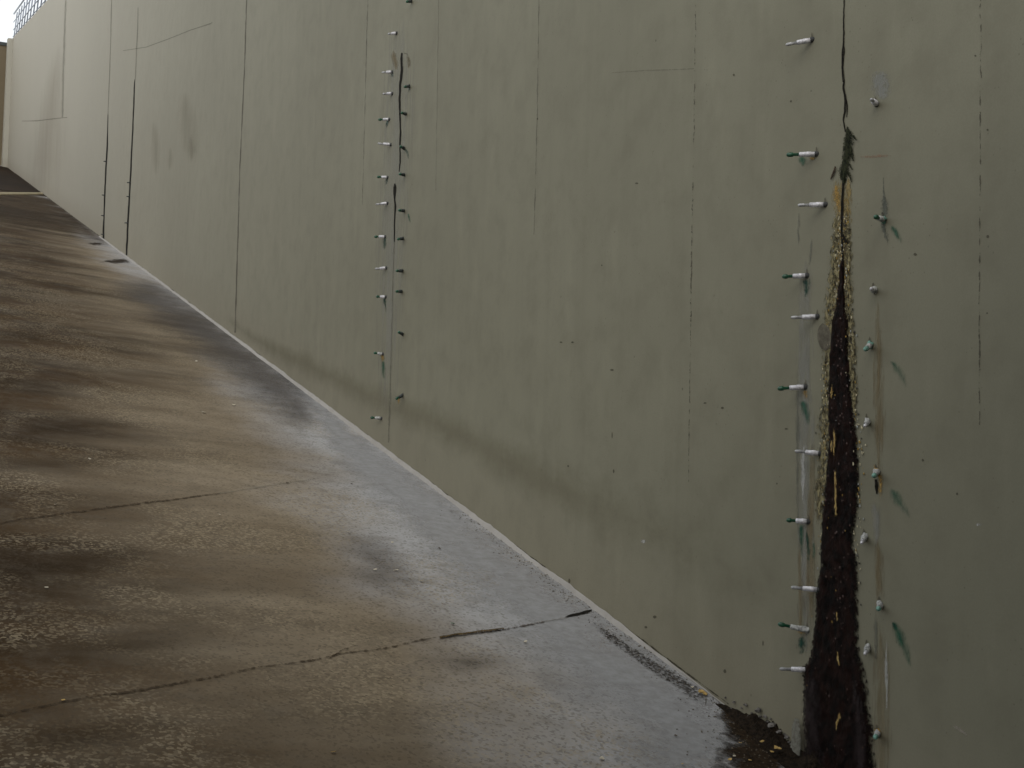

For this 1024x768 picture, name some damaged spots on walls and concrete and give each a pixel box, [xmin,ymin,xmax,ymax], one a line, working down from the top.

crack [840,0,848,132]
crack [393,53,403,242]
crack [840,181,848,308]
crack [4,493,220,523]
water stain [796,206,878,768]
crack [0,609,592,716]